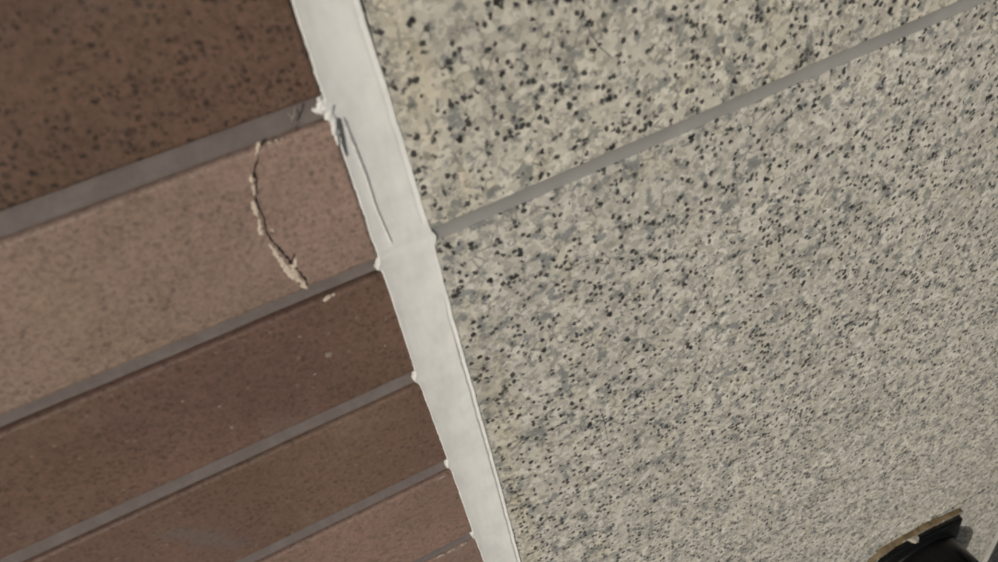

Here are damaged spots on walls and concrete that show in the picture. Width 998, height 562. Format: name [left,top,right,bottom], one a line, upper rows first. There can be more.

crack [249,141,308,289]